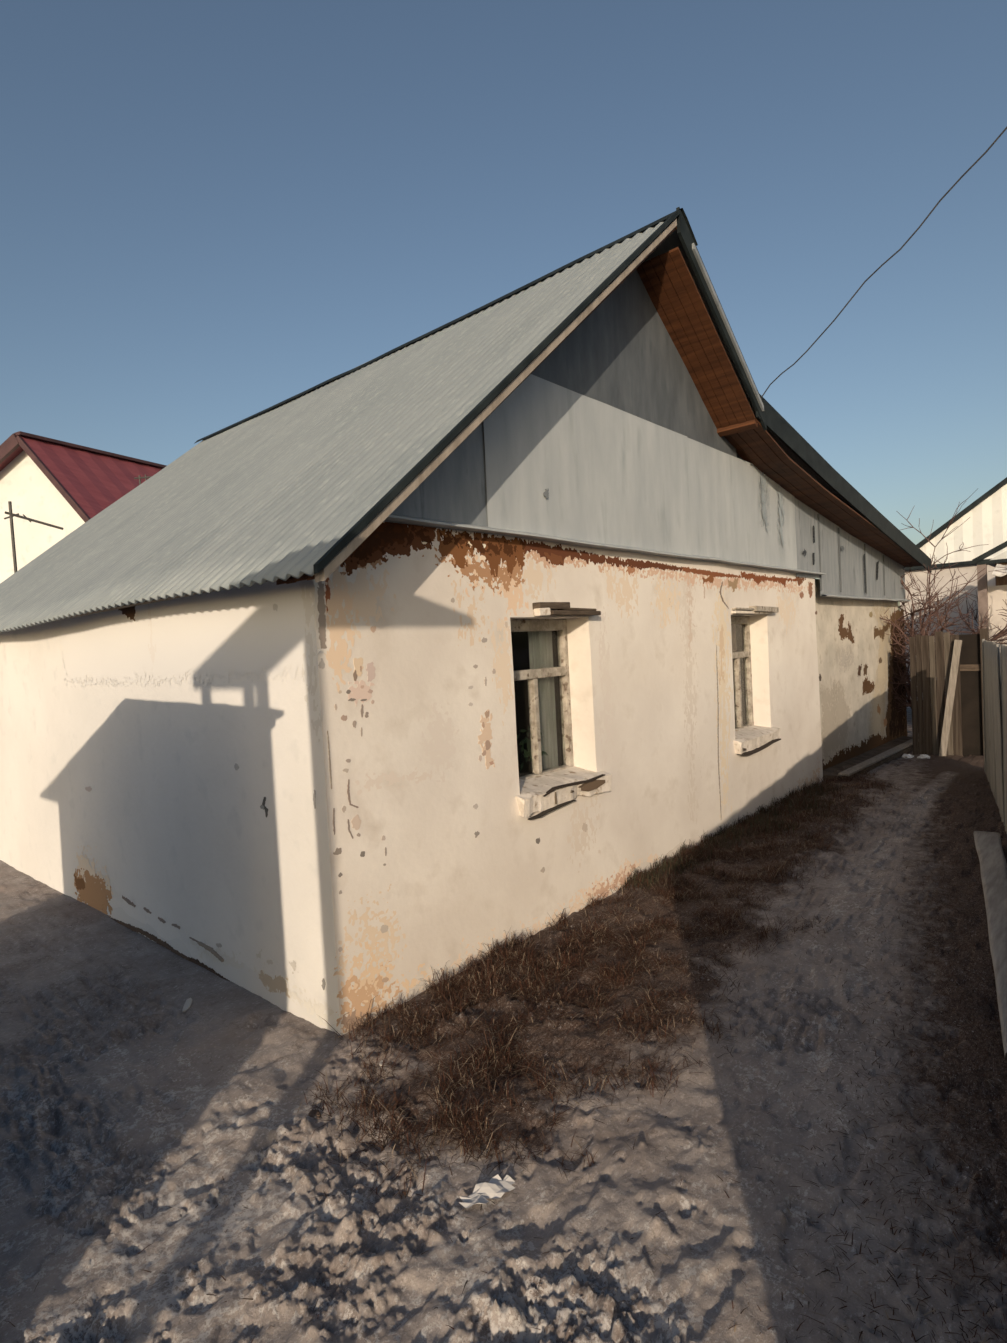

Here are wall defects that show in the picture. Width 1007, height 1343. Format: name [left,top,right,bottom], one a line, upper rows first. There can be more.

flaking render [340,522,817,614]
peeling [334,657,376,737]
flaking render [822,609,908,770]
flaking render [74,868,200,943]